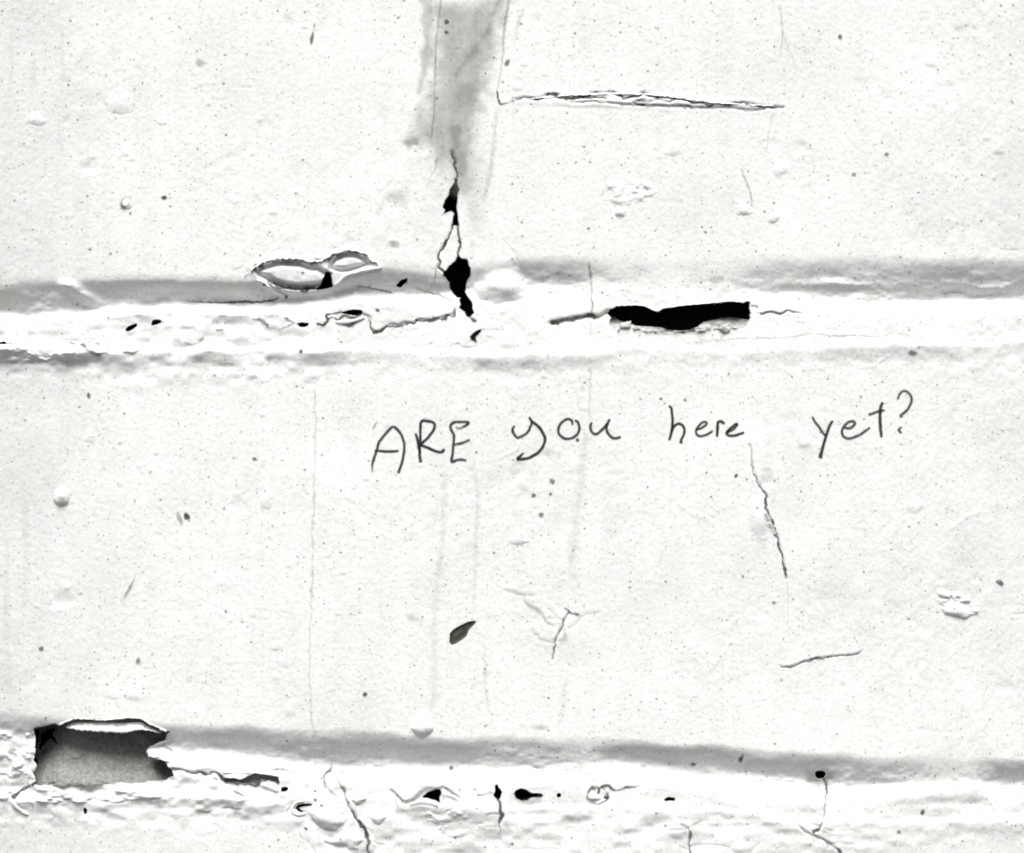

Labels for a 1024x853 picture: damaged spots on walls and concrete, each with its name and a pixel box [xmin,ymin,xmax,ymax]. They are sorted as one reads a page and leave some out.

crack [496,91,777,111]
crack [365,152,477,334]
spalling [606,300,752,335]
crack [754,475,786,576]
crack [784,653,858,668]
spalling [13,716,174,788]
spalling [223,773,280,785]
crack [812,828,841,853]